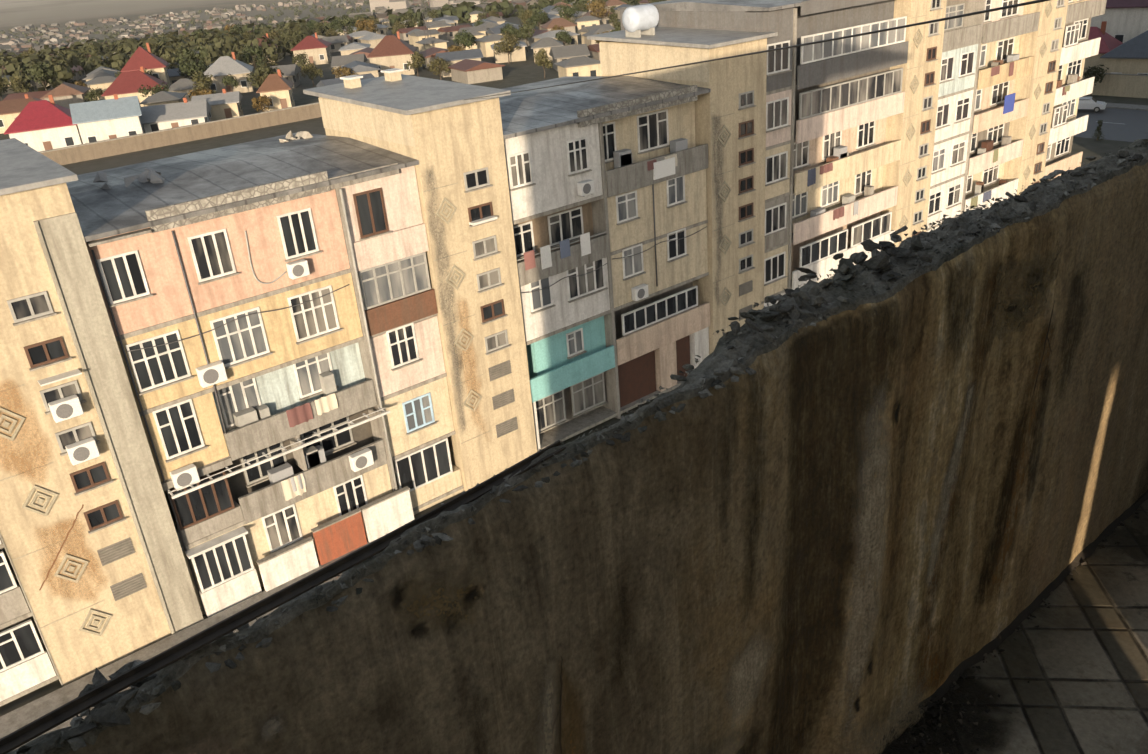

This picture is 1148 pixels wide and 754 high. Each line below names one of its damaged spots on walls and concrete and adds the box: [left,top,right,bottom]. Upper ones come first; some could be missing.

leakage [731,305,898,754]